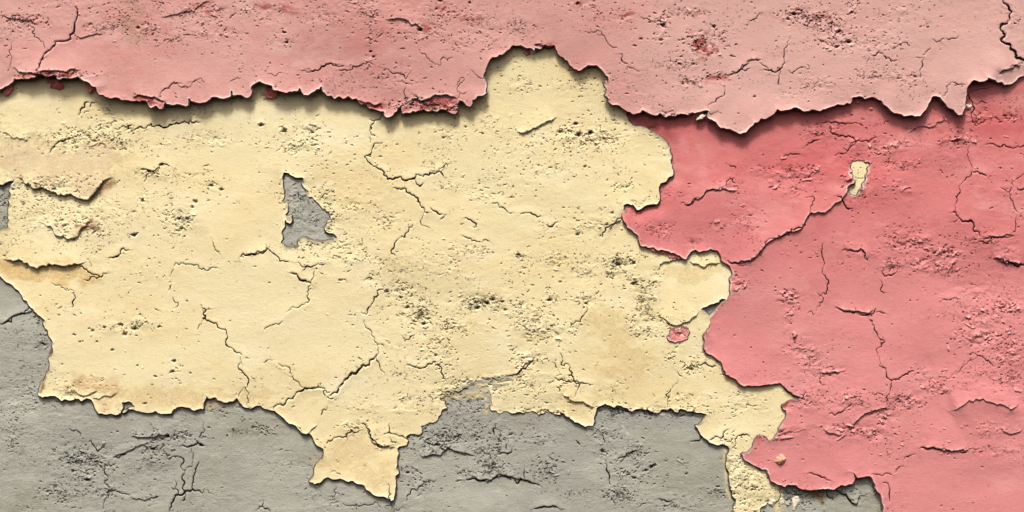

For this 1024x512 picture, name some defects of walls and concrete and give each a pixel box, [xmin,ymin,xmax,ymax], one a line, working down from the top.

crack [6,8,78,71]
peeling [0,60,488,119]
peeling [0,127,119,228]
flaking render [58,218,103,240]
flaking render [279,174,335,251]
crack [364,116,554,255]
peeling [555,60,1024,329]
crack [170,243,446,415]
flaking render [0,267,902,512]
crack [508,355,587,396]
crack [809,245,911,400]
crack [163,428,210,511]